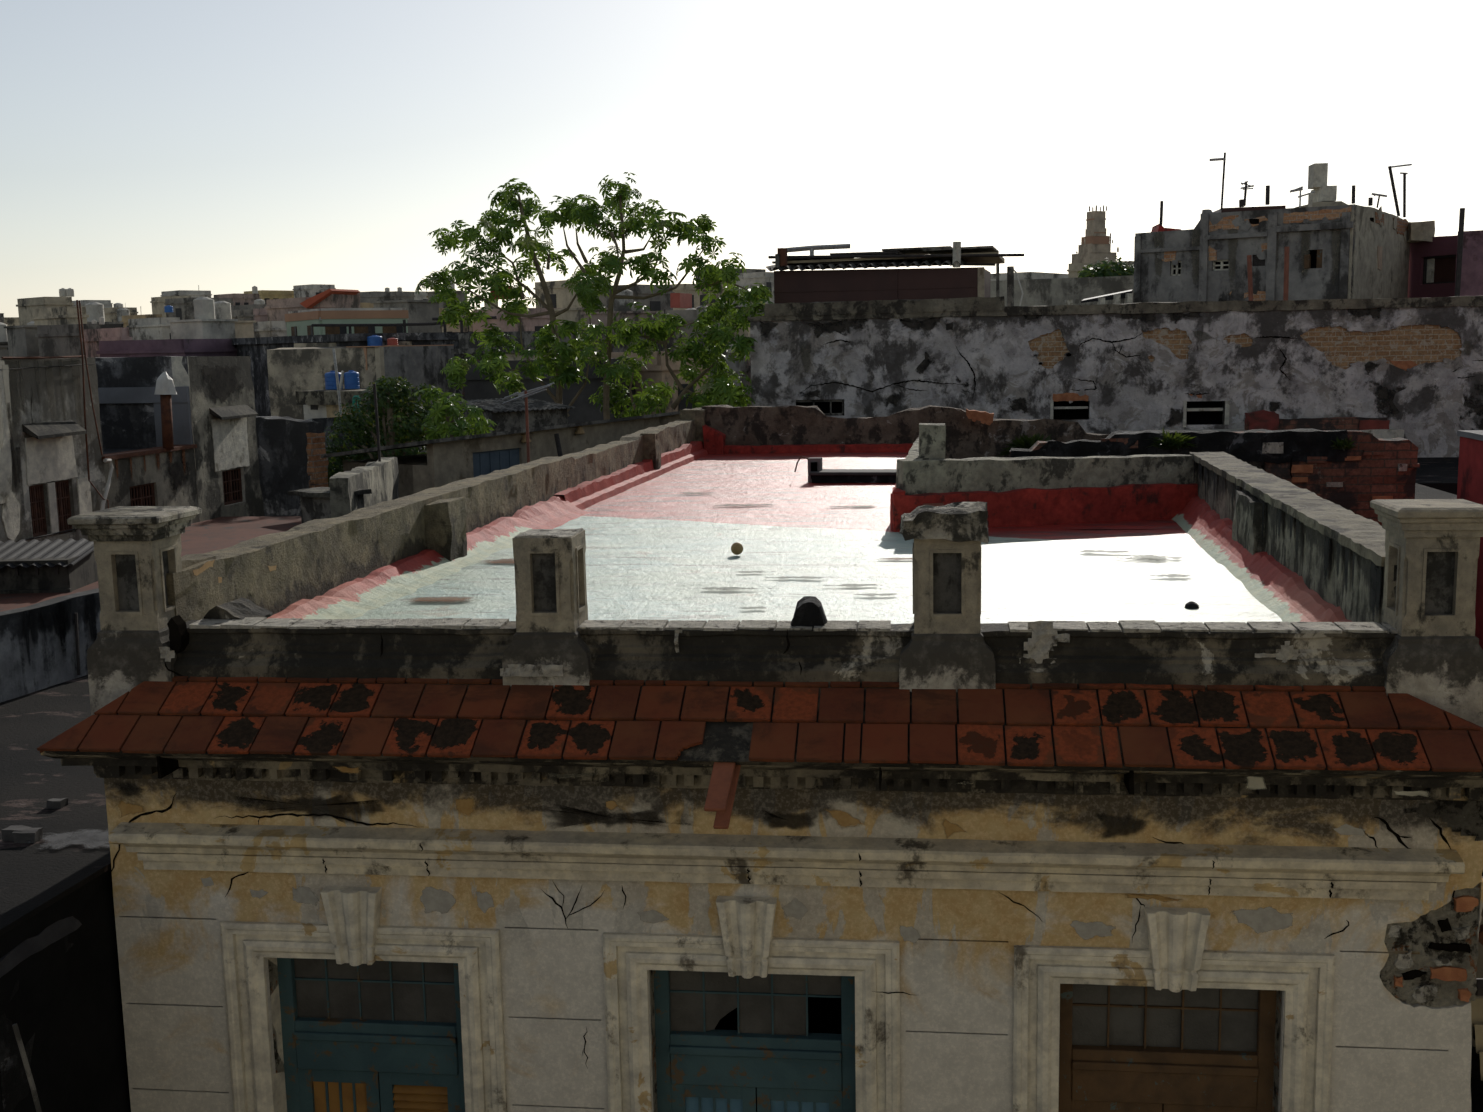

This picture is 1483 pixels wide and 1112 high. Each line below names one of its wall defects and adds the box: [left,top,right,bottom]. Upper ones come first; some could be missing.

crack [798,345,976,399]
flaking render [1028,329,1073,369]
flaking render [1301,322,1465,371]
water stain [0,359,82,516]
water stain [23,594,97,664]
water stain [241,795,382,823]
water stain [552,807,684,827]
water stain [764,811,812,829]
crack [1365,817,1451,849]
flaking render [1380,883,1480,1008]